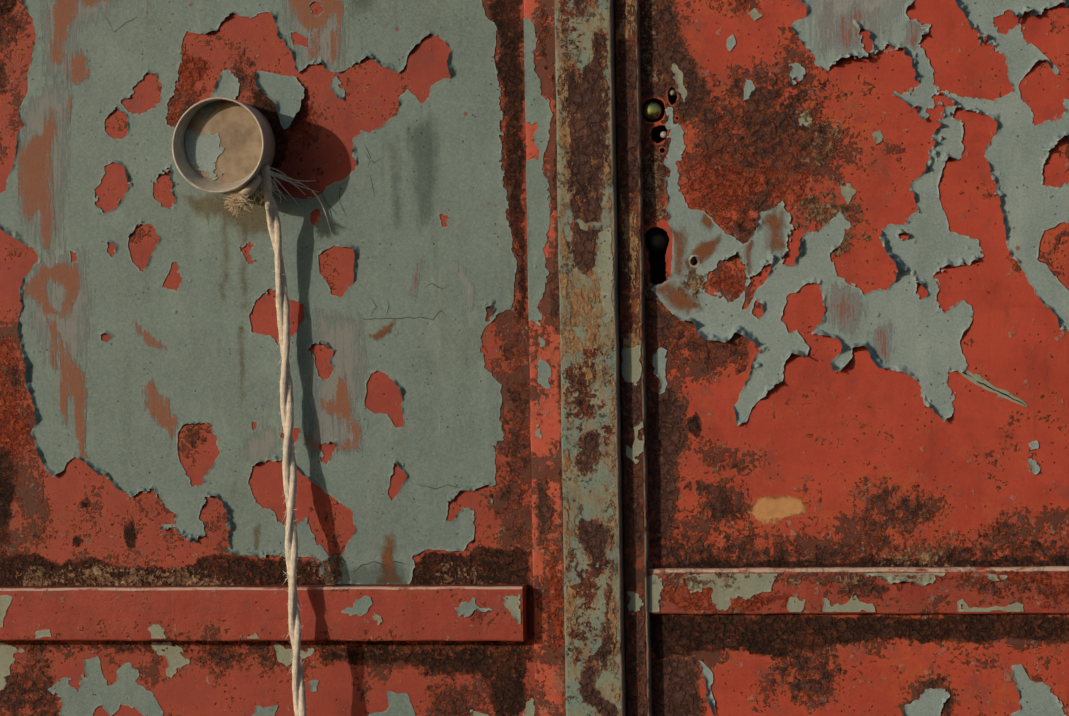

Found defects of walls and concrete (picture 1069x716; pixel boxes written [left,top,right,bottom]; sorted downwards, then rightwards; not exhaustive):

rust [0,0,30,95]
peeling [651,0,1069,426]
peeling [0,0,553,628]
rust [373,323,393,340]
rust [378,0,1069,716]
peeling [685,574,777,611]
peeling [0,642,25,690]
peeling [48,656,164,716]
peeling [148,624,190,679]
rust [0,639,534,716]
peeling [904,688,950,716]
peeling [1010,664,1067,716]